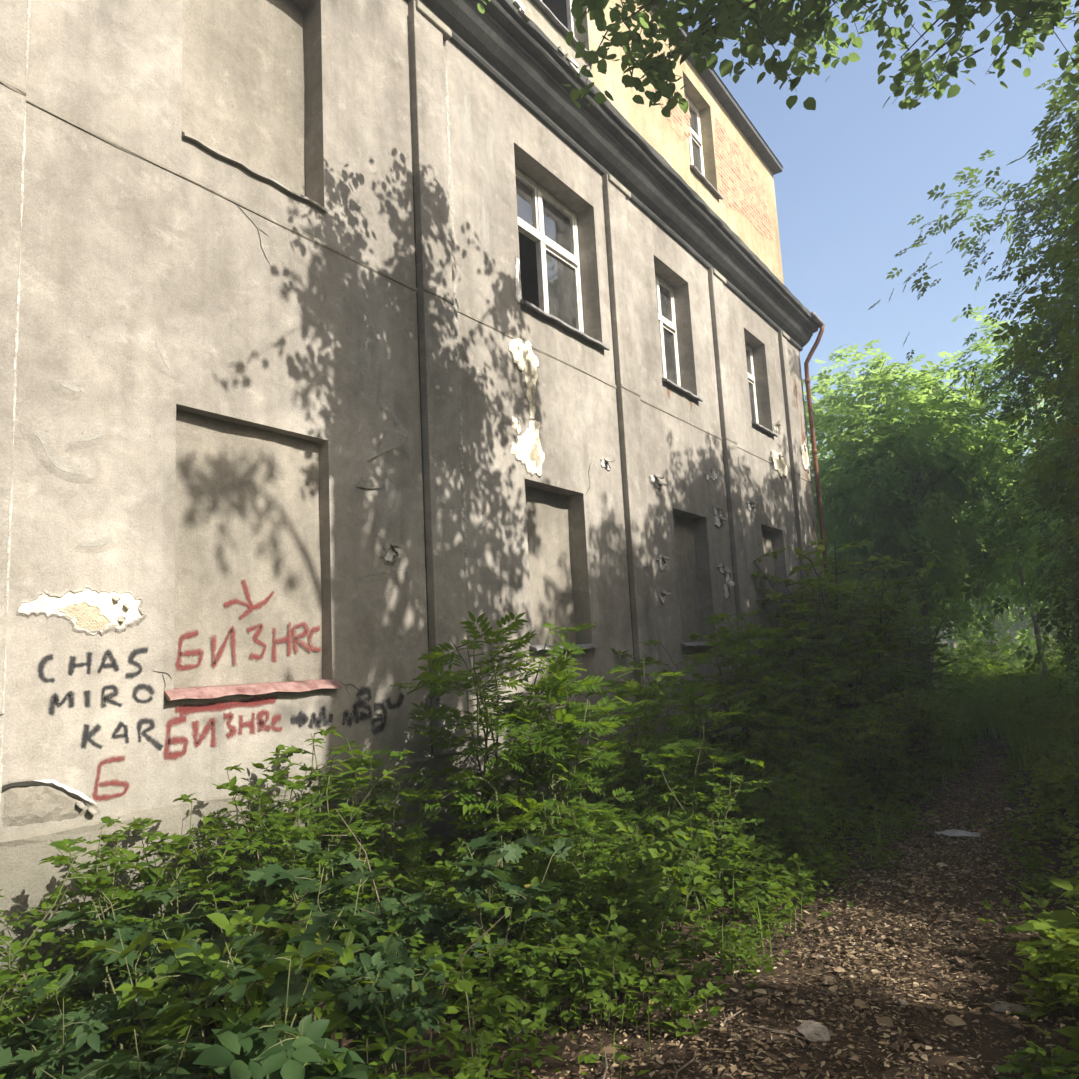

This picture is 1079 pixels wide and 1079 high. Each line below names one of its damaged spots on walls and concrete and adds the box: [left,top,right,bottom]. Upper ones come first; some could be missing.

flaking render [508,338,545,478]
flaking render [600,457,615,471]
flaking render [770,449,788,480]
flaking render [800,441,811,474]
flaking render [648,473,668,489]
flaking render [6,477,147,637]
flaking render [379,541,402,566]